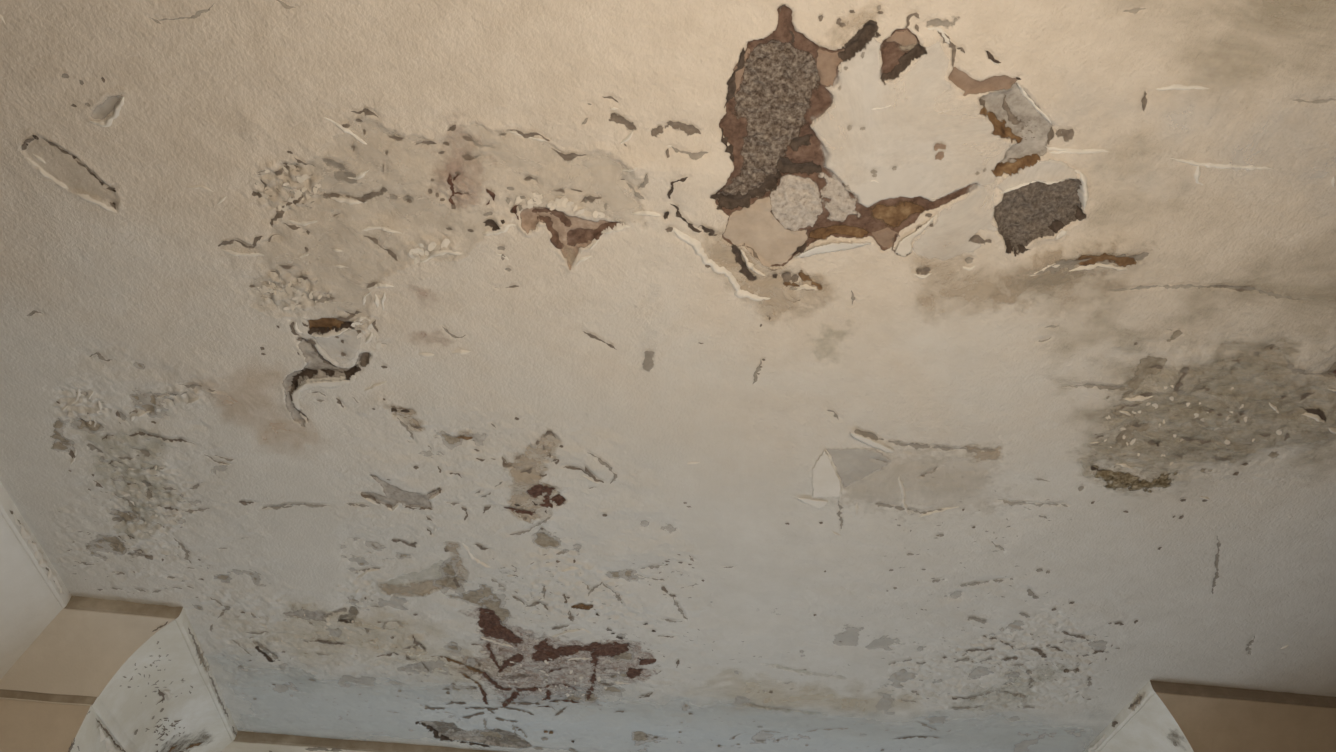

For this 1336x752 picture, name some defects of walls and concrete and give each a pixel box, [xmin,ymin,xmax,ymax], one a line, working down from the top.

peeling [22,135,117,213]
peeling [71,96,124,127]
peeling [323,108,378,152]
spalling [962,160,1089,271]
peeling [51,125,704,752]
peeling [793,429,1068,536]
peeling [876,476,1018,595]
spalling [1212,536,1221,594]
rust [425,596,680,750]
peeling [833,566,1138,752]